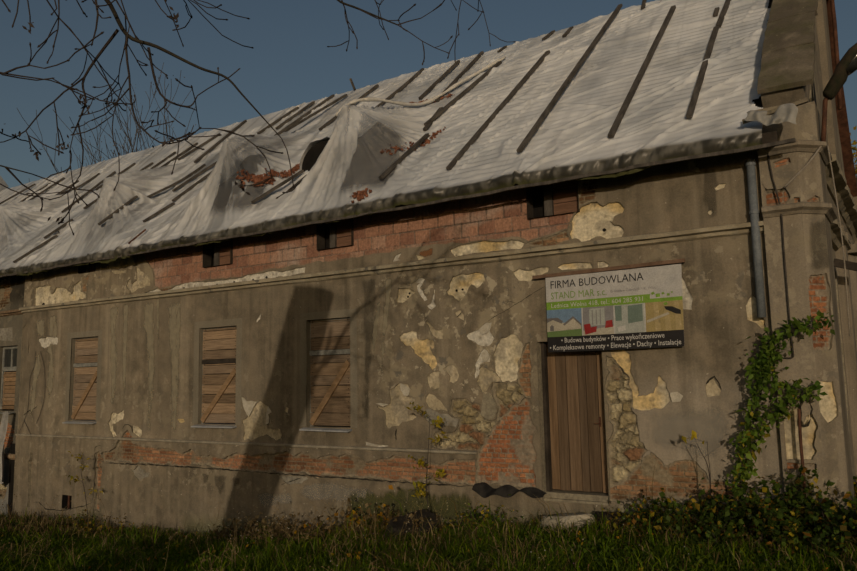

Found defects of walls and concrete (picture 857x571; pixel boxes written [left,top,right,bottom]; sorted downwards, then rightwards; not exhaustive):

flaking render [450,179,625,257]
flaking render [32,269,90,306]
flaking render [396,278,436,310]
flaking render [446,272,485,320]
flaking render [780,268,849,471]
flaking render [108,410,124,437]
flaking render [242,396,282,441]
flaking render [376,321,537,488]
flaking render [604,349,740,505]